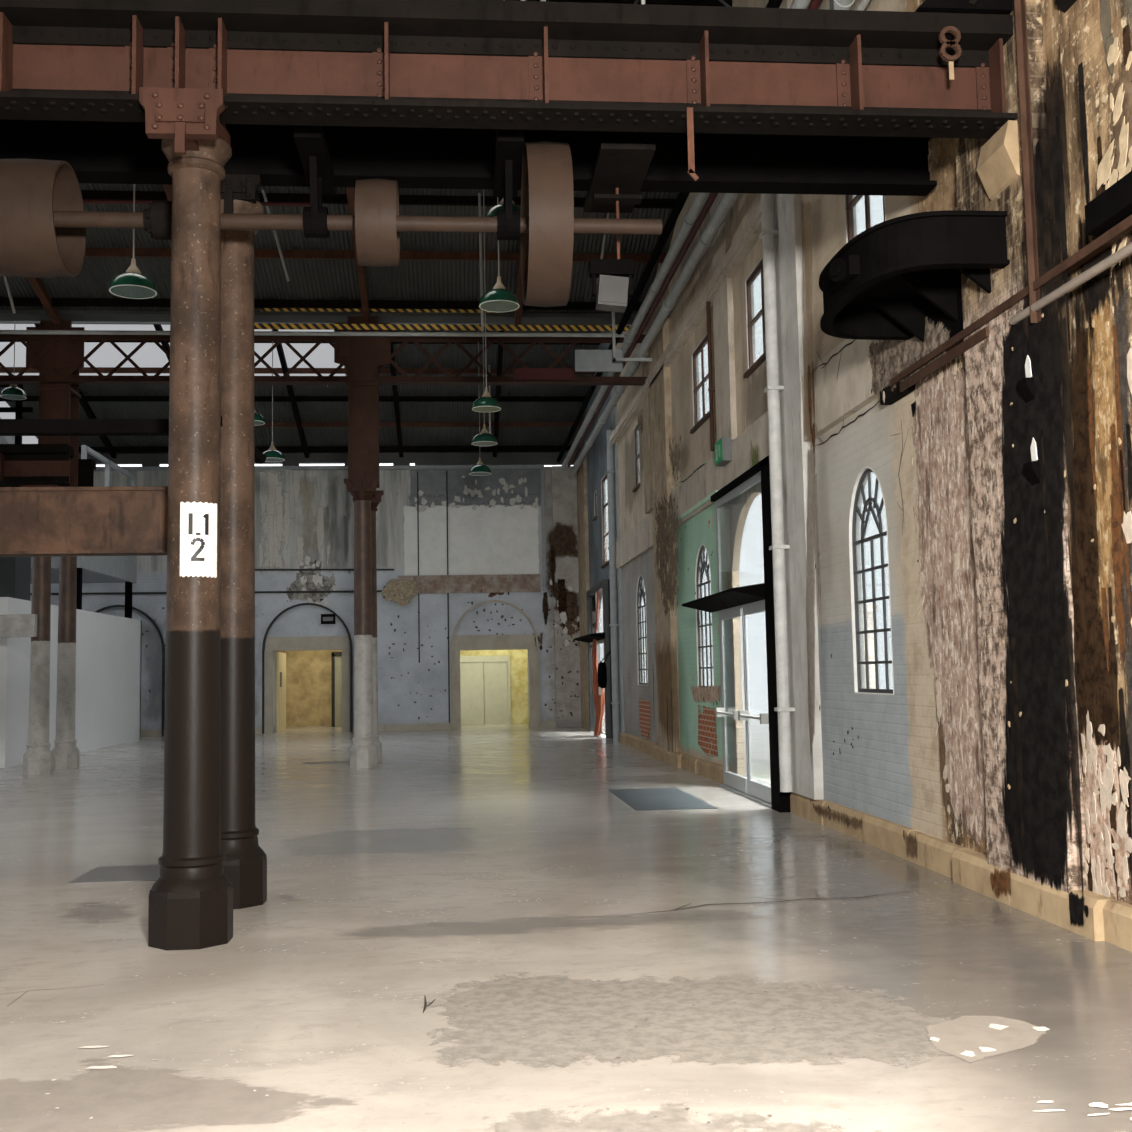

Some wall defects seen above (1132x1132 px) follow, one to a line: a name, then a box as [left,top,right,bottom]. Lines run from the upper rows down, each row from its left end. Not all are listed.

peeling [1097,25,1132,195]
peeling [1105,234,1131,277]
peeling [409,475,540,513]
peeling [1121,502,1132,544]
peeling [543,580,580,653]
peeling [1081,712,1132,901]